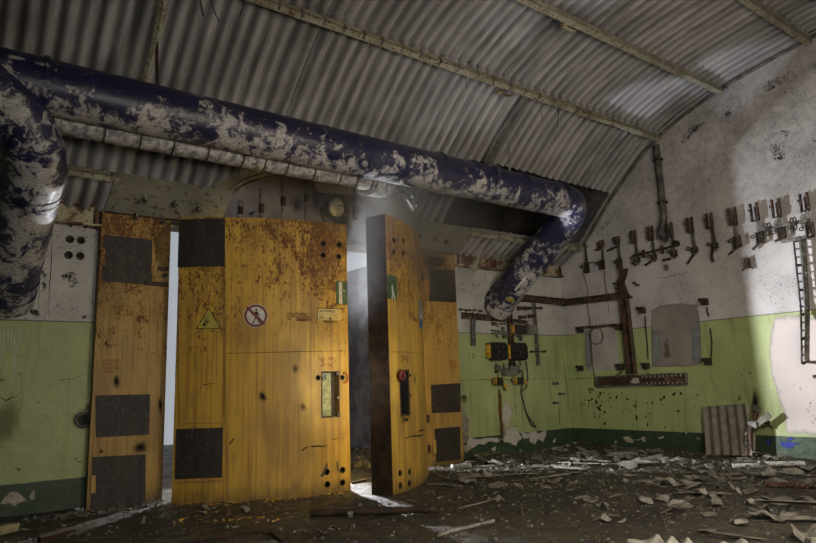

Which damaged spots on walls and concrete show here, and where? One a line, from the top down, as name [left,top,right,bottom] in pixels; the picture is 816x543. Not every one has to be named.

peeling [770,316,816,434]
peeling [462,398,556,452]
peeling [1,491,35,506]